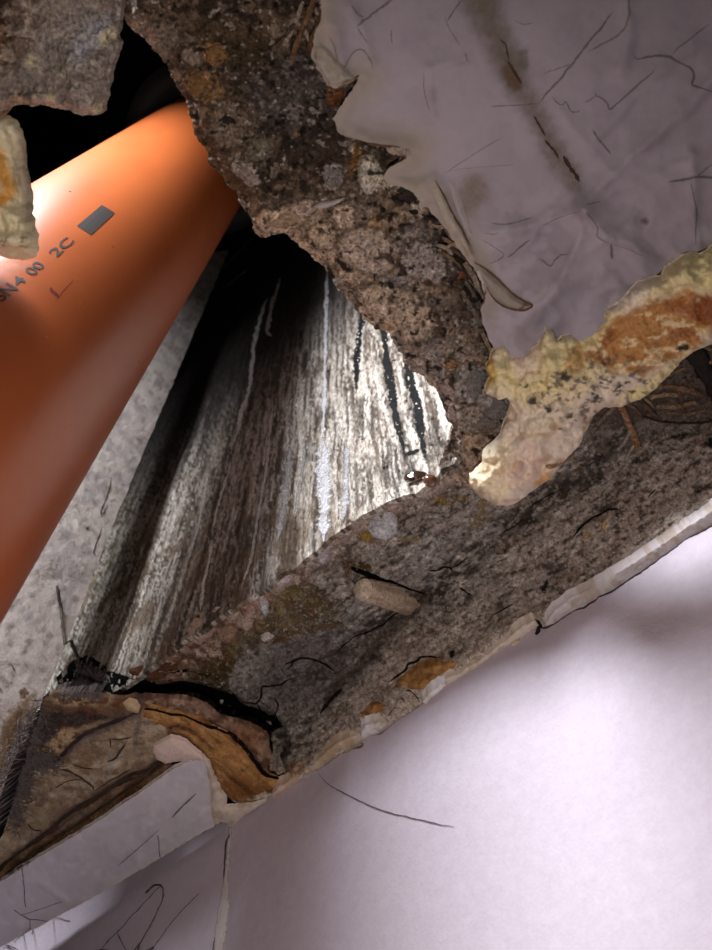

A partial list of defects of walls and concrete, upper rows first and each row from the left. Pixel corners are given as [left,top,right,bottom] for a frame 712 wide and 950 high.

crack [534,0,630,181]
spalling [0,0,510,489]
peeling [430,180,533,312]
spalling [129,665,144,676]
efflorescence [199,540,213,610]
efflorescence [212,277,281,528]
efflorescence [242,402,274,585]
water stain [276,270,350,543]
crack [242,613,400,717]
spalling [143,359,712,778]
crack [5,708,280,874]
crack [319,774,453,827]